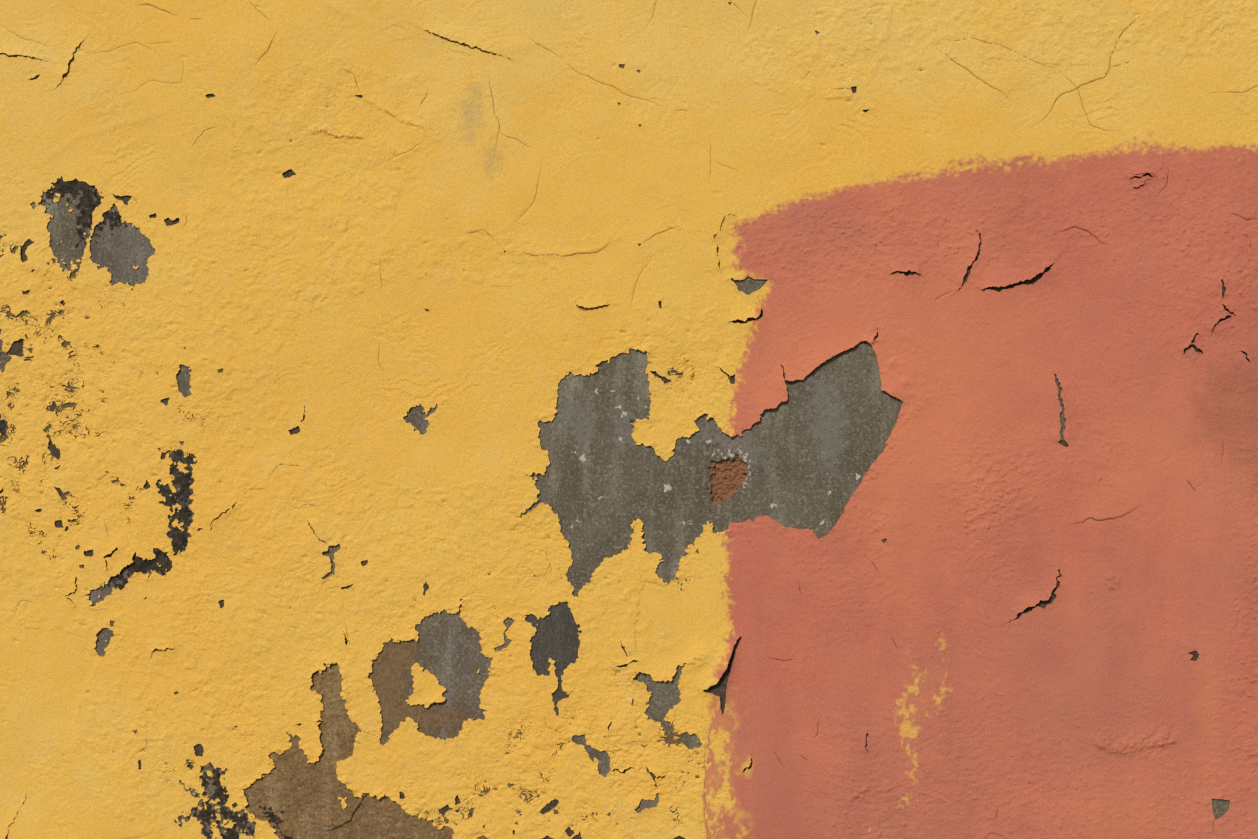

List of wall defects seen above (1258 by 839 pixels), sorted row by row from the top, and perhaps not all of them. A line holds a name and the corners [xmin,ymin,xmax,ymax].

crack [891,226,1106,300]
peeling [0,300,115,560]
crack [1054,373,1066,440]
peeling [106,471,151,523]
peeling [232,328,912,839]
crack [1009,569,1062,622]